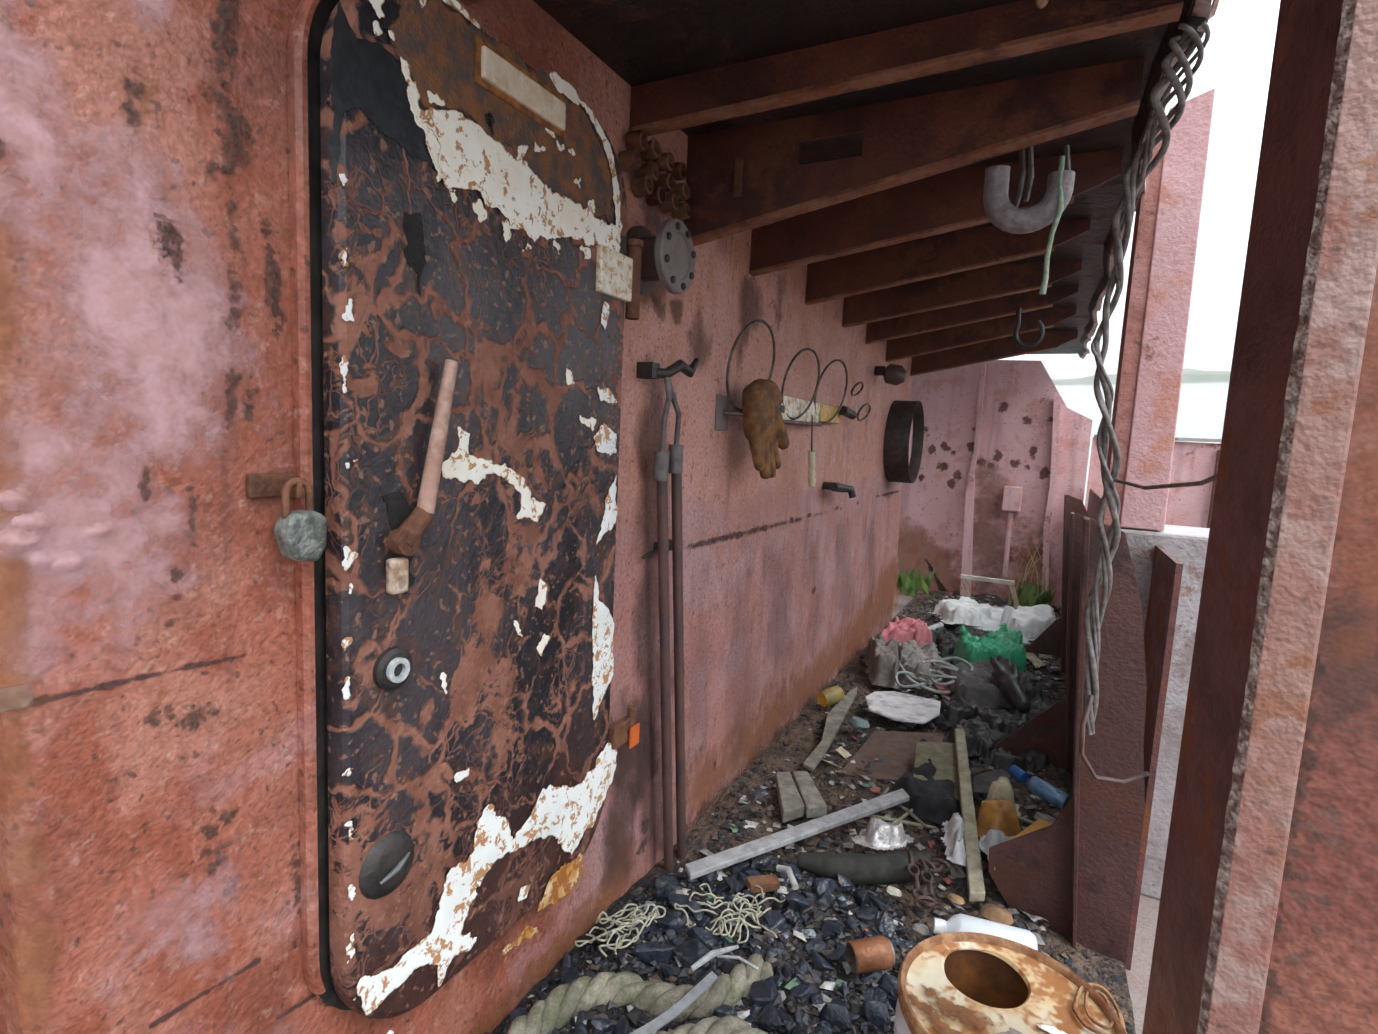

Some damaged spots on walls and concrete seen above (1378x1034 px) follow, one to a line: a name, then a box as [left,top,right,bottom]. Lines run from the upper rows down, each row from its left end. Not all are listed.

peeling [369,0,395,41]
rust [390,0,614,225]
peeling [400,57,623,259]
peeling [339,355,349,394]
peeling [579,415,617,456]
peeling [596,475,618,545]
peeling [342,546,359,594]
peeling [592,575,615,720]
peeling [342,676,350,700]
peeling [353,743,617,1015]
rust [521,826,631,992]
peeling [346,933,355,964]